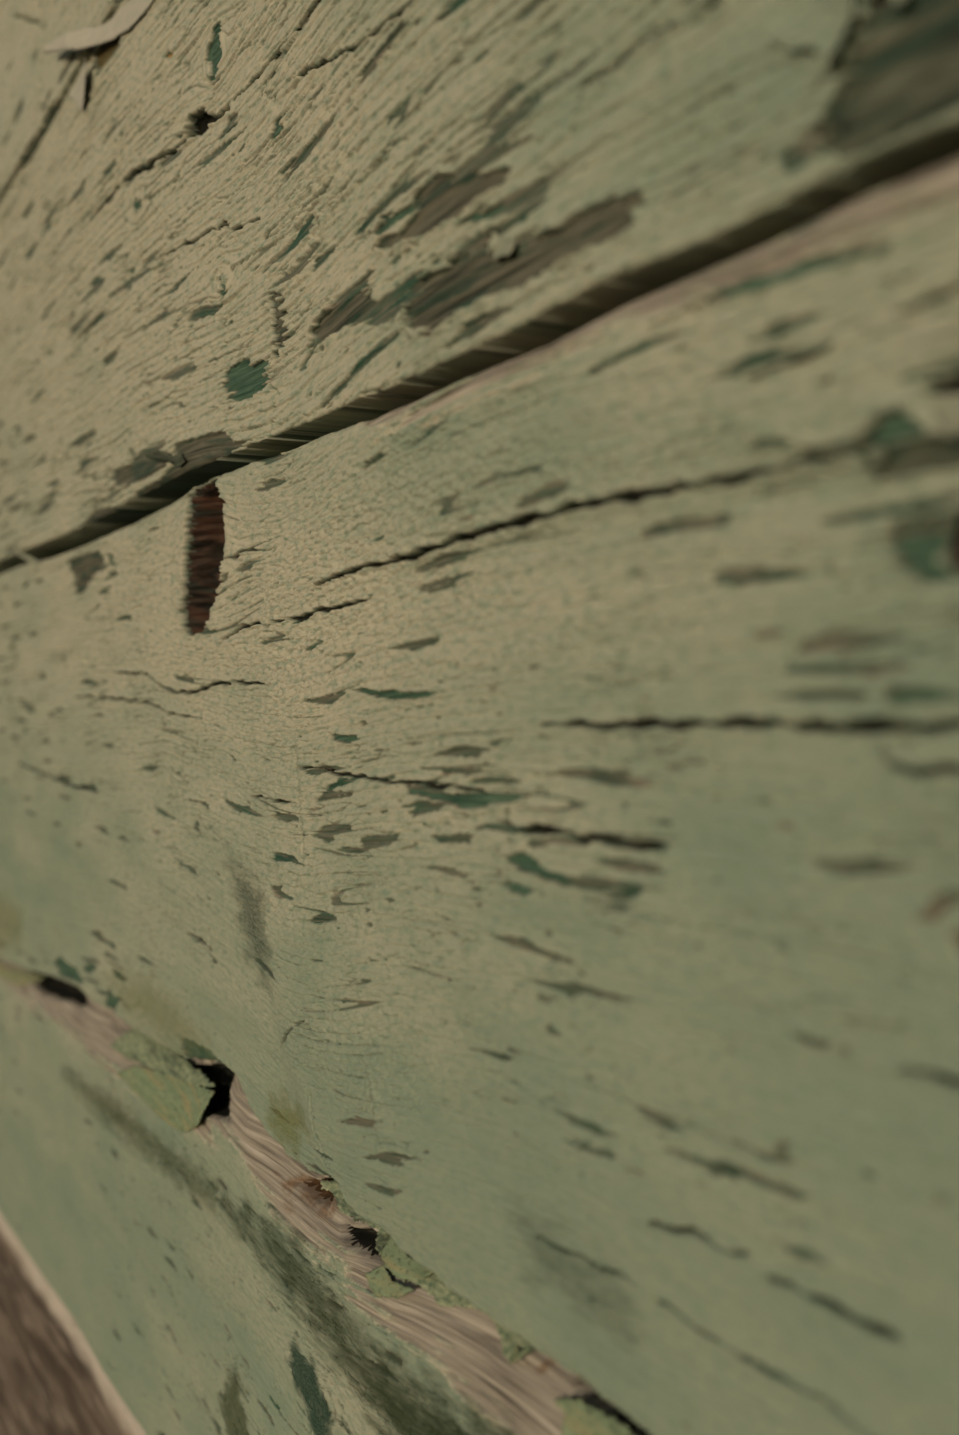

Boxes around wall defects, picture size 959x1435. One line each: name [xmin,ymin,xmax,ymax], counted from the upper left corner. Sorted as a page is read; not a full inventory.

peeling [818,0,959,157]
crack [111,112,220,200]
peeling [377,167,643,336]
peeling [866,395,959,480]
crack [227,441,877,638]
crack [78,672,265,717]
crack [547,717,959,775]
crack [304,766,665,850]
peeling [110,1029,221,1132]
peeling [320,1179,535,1365]
crack [652,1221,898,1336]
peeling [554,1397,633,1435]